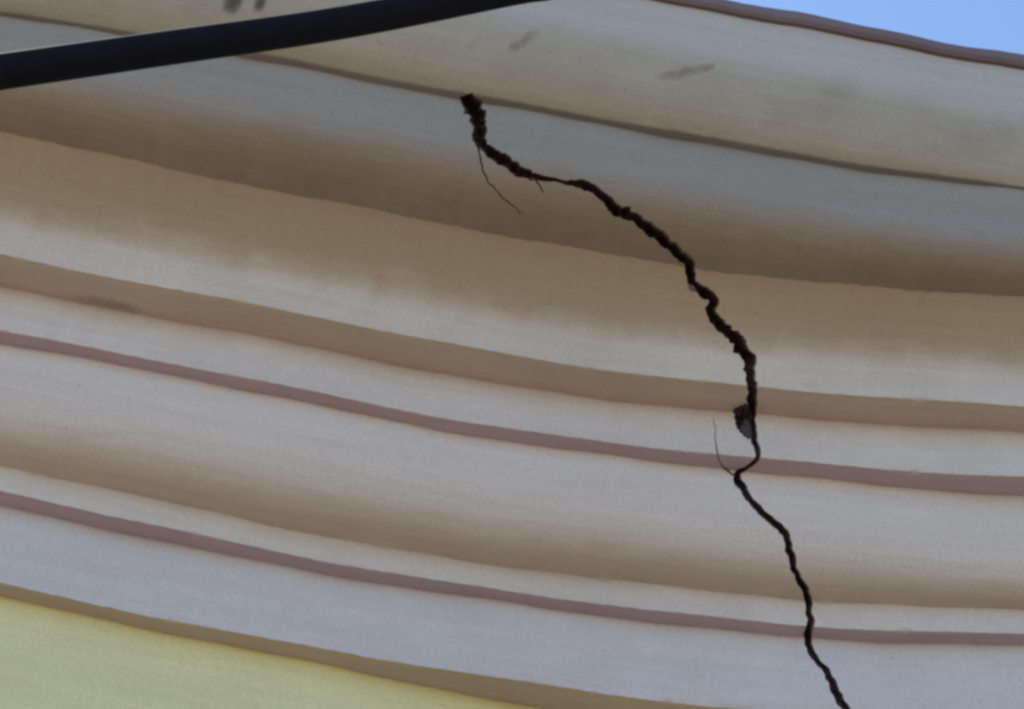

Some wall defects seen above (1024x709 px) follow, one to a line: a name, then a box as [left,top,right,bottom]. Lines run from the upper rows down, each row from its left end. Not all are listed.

crack [460,94,850,709]